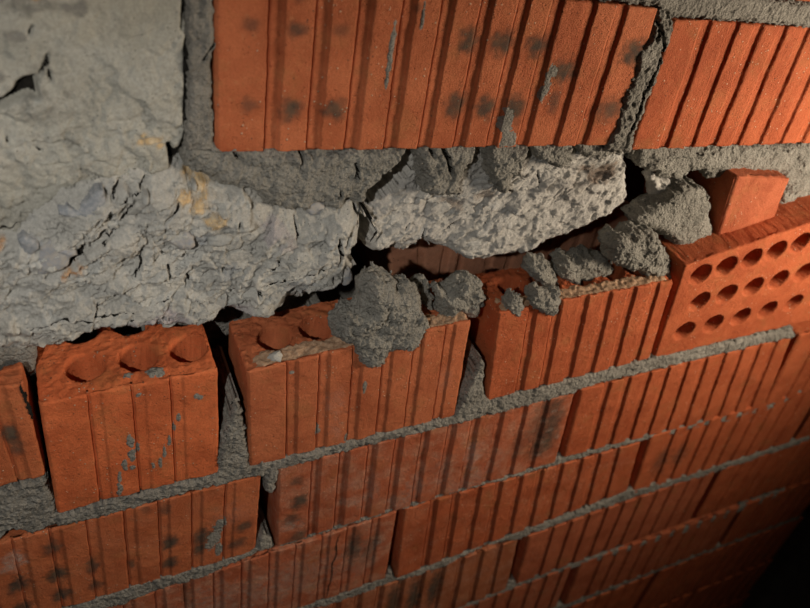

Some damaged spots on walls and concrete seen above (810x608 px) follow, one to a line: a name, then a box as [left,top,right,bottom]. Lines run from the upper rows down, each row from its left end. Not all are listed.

spalling [0,54,51,99]
spalling [641,169,671,194]
spalling [0,147,627,348]
spalling [267,351,283,362]